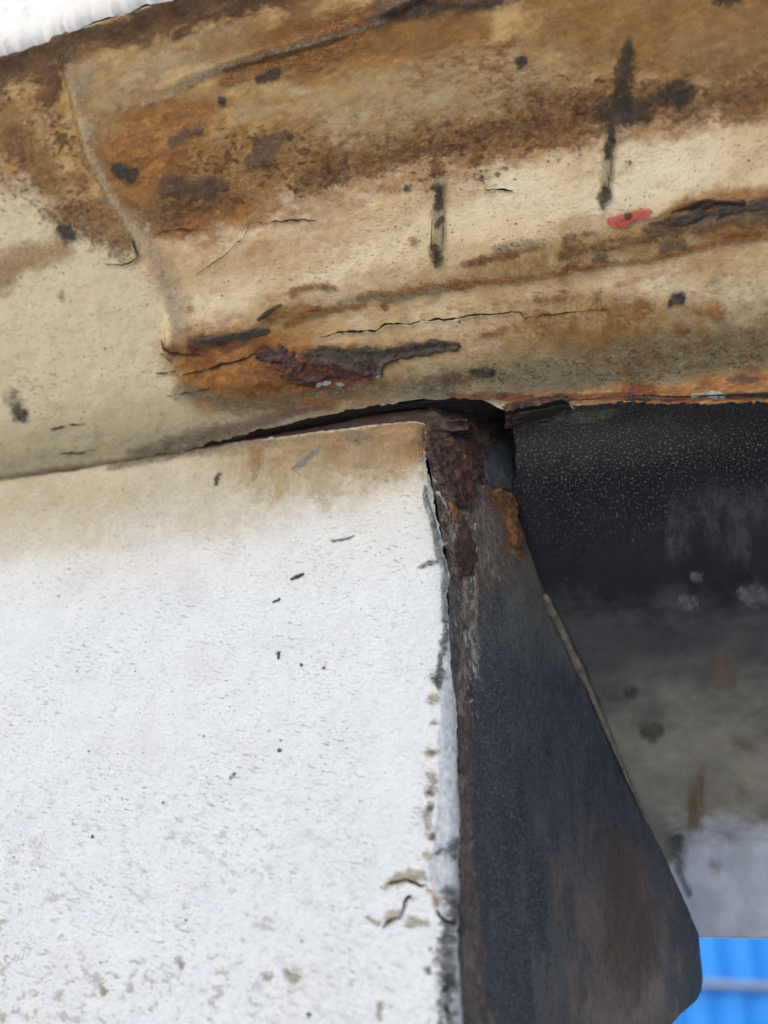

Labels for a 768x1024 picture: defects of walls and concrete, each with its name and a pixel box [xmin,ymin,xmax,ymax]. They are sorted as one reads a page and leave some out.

corrosion [0,0,518,107]
damp [0,0,768,285]
crack [157,219,316,274]
spalling [646,198,768,227]
spalling [186,304,461,389]
crack [320,309,606,338]
crack [22,399,473,477]
corrosion [107,186,768,1024]